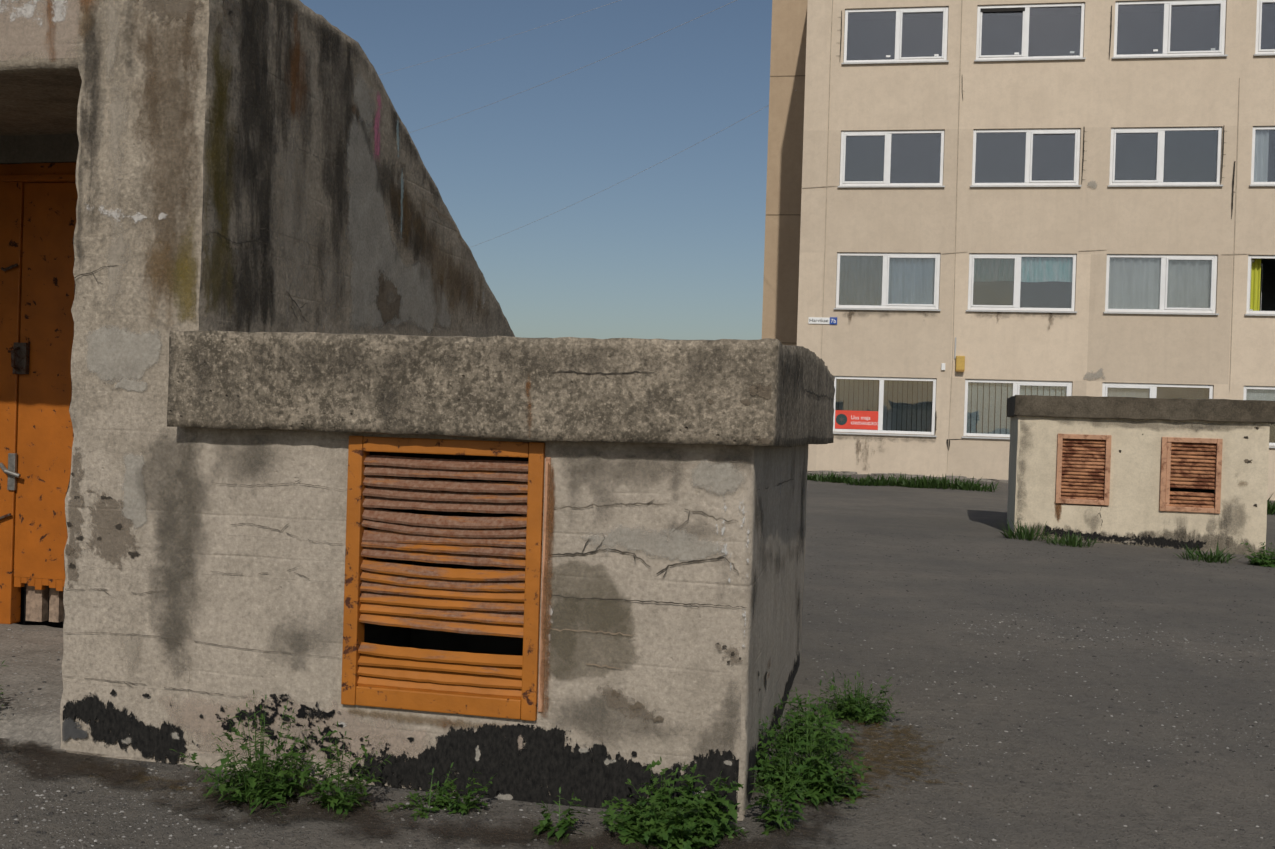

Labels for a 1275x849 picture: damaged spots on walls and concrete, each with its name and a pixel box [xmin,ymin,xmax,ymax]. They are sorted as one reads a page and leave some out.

damp [78,1,192,305]
damp [210,0,368,329]
peeling [324,76,451,332]
damp [393,111,416,159]
peeling [62,652,800,822]